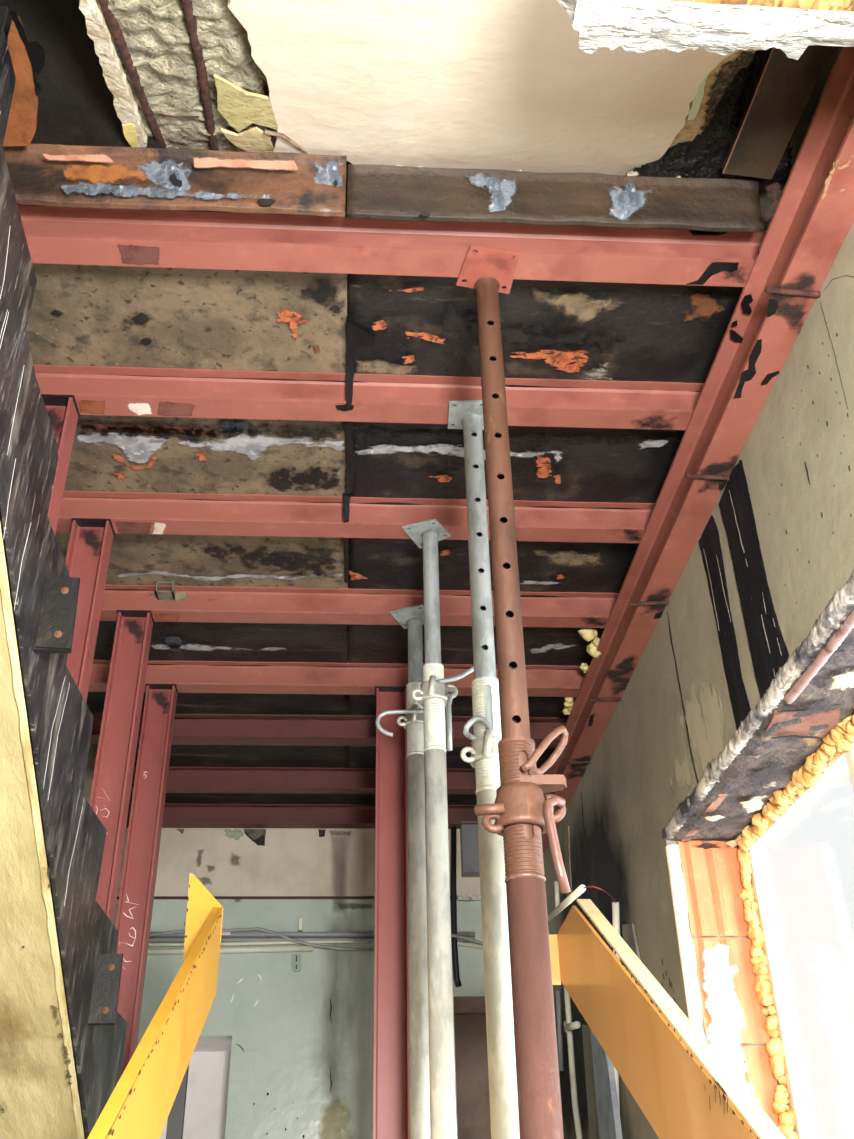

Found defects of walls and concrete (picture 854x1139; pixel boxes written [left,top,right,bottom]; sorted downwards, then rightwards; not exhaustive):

spalling [89,0,308,154]
spalling [669,49,761,148]
rust [63,164,148,183]
rust [684,293,723,321]